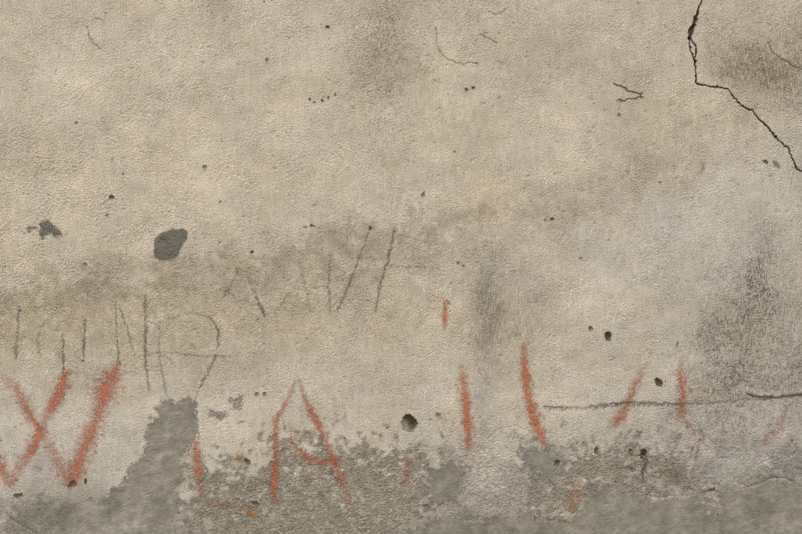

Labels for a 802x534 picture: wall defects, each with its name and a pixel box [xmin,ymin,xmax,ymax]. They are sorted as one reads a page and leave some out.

crack [613,83,644,102]
crack [688,0,802,172]
water stain [27,220,62,240]
water stain [154,228,188,260]
crack [589,401,697,409]
crack [747,392,802,400]
spalling [9,397,802,534]